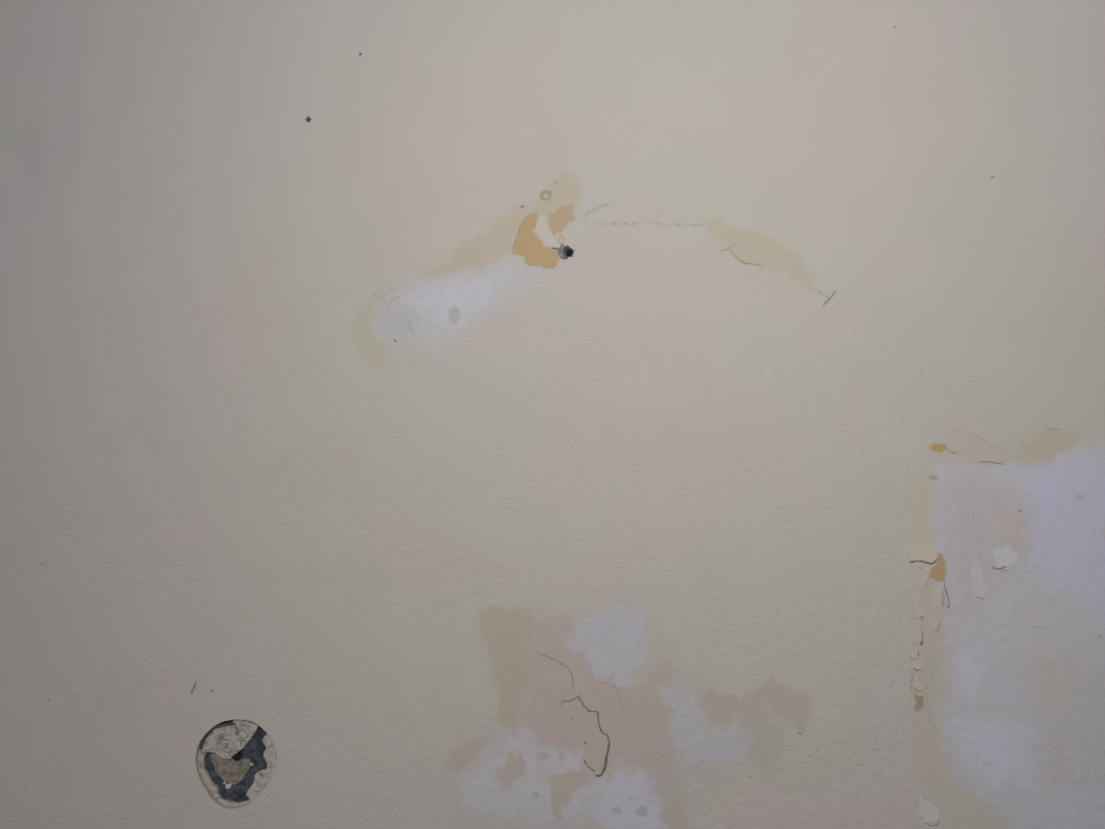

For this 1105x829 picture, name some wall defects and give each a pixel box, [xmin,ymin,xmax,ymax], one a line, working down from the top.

peeling [511,189,577,271]
crack [536,653,624,778]
spalling [195,719,277,809]